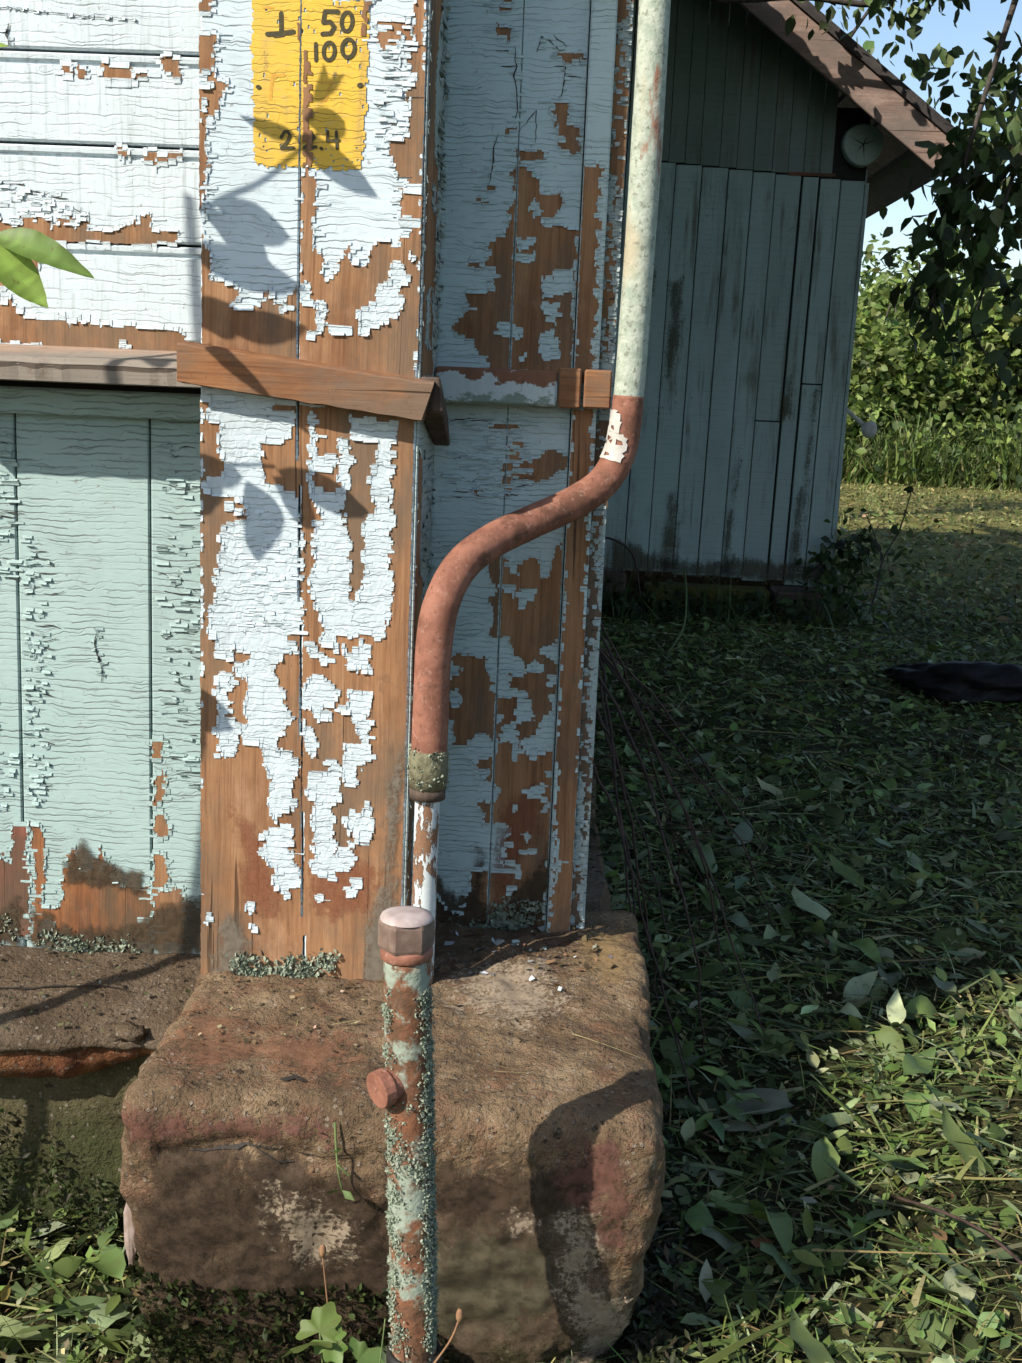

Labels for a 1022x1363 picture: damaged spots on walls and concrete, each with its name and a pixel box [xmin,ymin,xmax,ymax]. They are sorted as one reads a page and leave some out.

peeling [0,0,443,378]
peeling [451,0,634,387]
peeling [470,406,609,502]
water stain [63,839,143,894]
water stain [0,896,252,973]
peeling [0,395,424,980]
rust [493,785,538,901]
peeling [436,500,608,933]